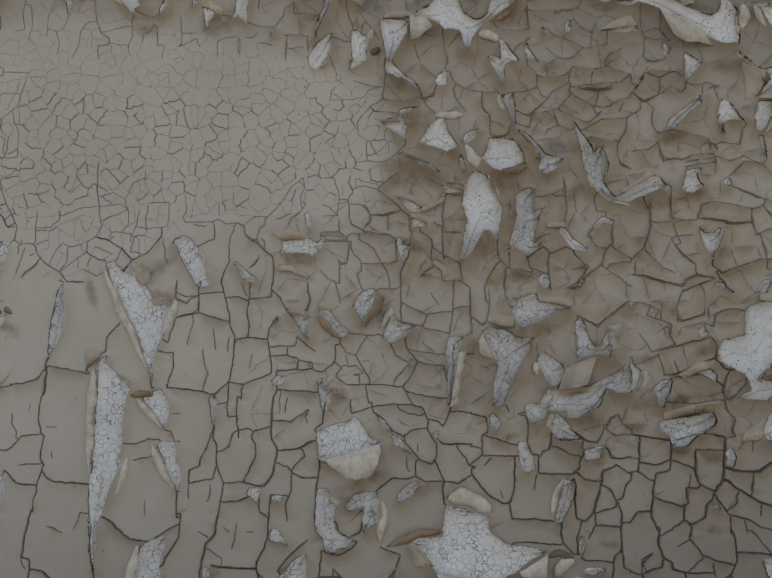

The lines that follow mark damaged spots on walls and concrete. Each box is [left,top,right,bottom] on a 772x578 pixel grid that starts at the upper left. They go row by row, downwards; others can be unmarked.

peeling [349,0,538,91]
crack [493,0,772,178]
peeling [598,0,772,135]
peeling [394,93,563,263]
peeling [508,188,587,254]
crack [540,161,582,237]
peeling [85,261,181,570]
peeling [316,416,381,480]
crack [473,185,772,578]
peeling [478,273,772,447]
peeling [125,535,166,578]
peeling [315,487,605,578]